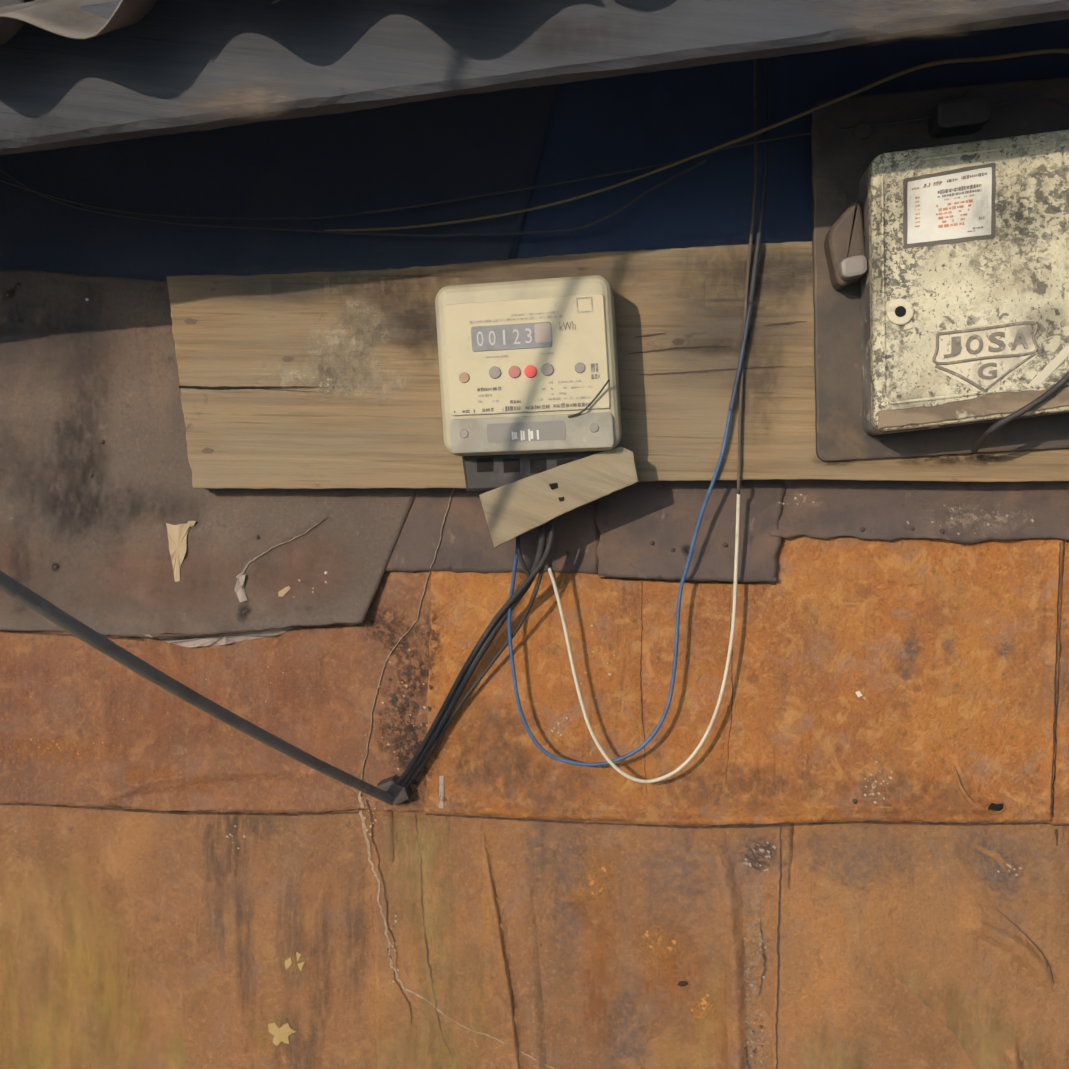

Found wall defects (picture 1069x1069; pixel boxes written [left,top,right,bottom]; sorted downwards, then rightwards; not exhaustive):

crack [179,385,346,393]
corrosion [379,668,433,760]
corrosion [0,803,359,816]
corrosion [426,542,1069,1069]
crack [358,792,555,1069]